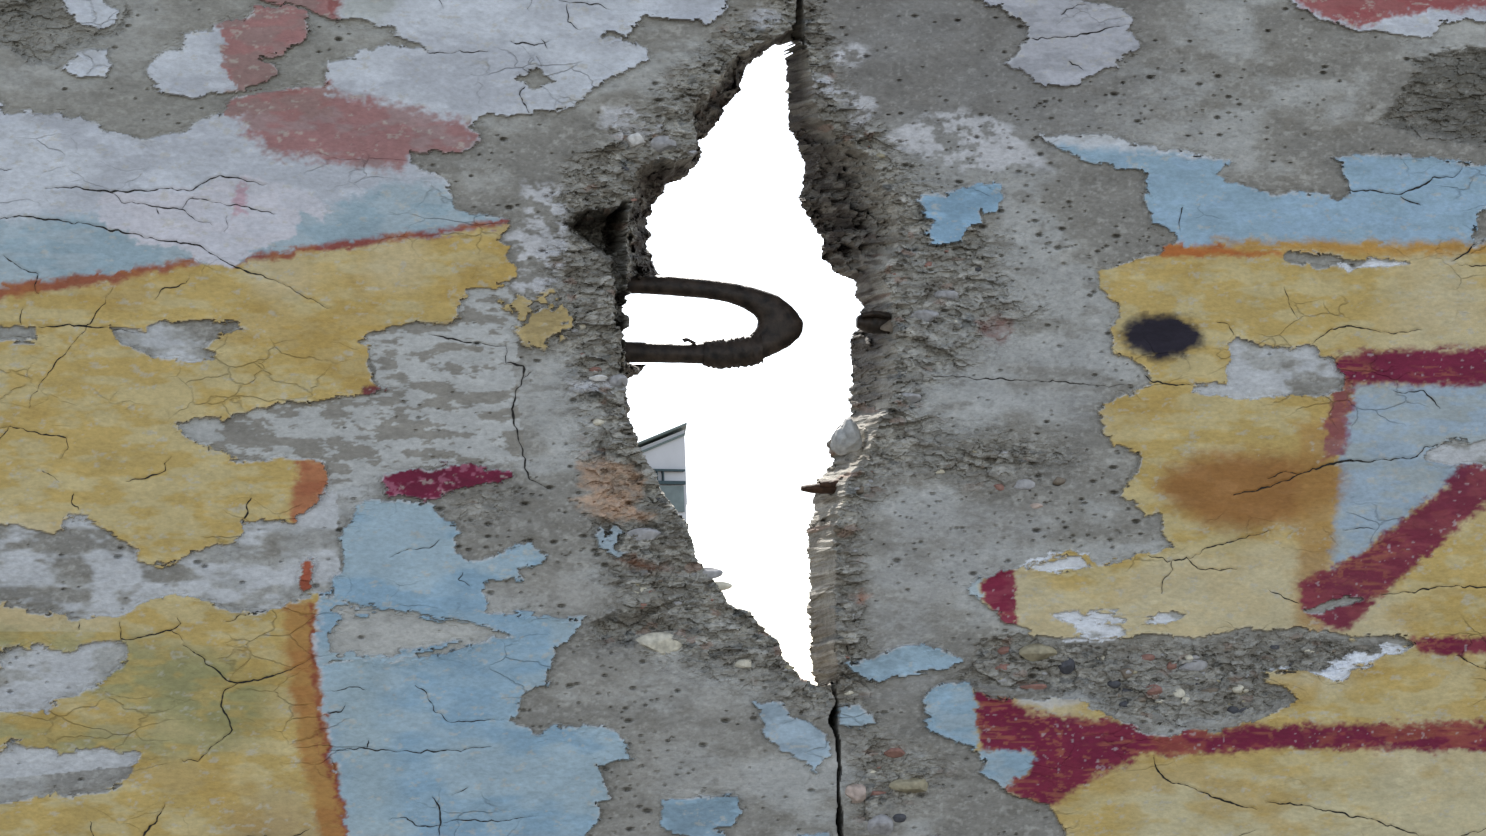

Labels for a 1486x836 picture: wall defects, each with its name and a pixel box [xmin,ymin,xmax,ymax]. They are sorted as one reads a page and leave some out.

crack [791,0,803,41]
crack [0,175,326,308]
crack [0,256,129,510]
spalling [0,0,896,836]
crack [436,335,545,487]
peeling [778,0,1486,836]
crack [1285,291,1420,341]
crack [143,805,165,836]
crack [119,618,313,761]
crack [827,683,842,836]
crack [1153,757,1417,836]